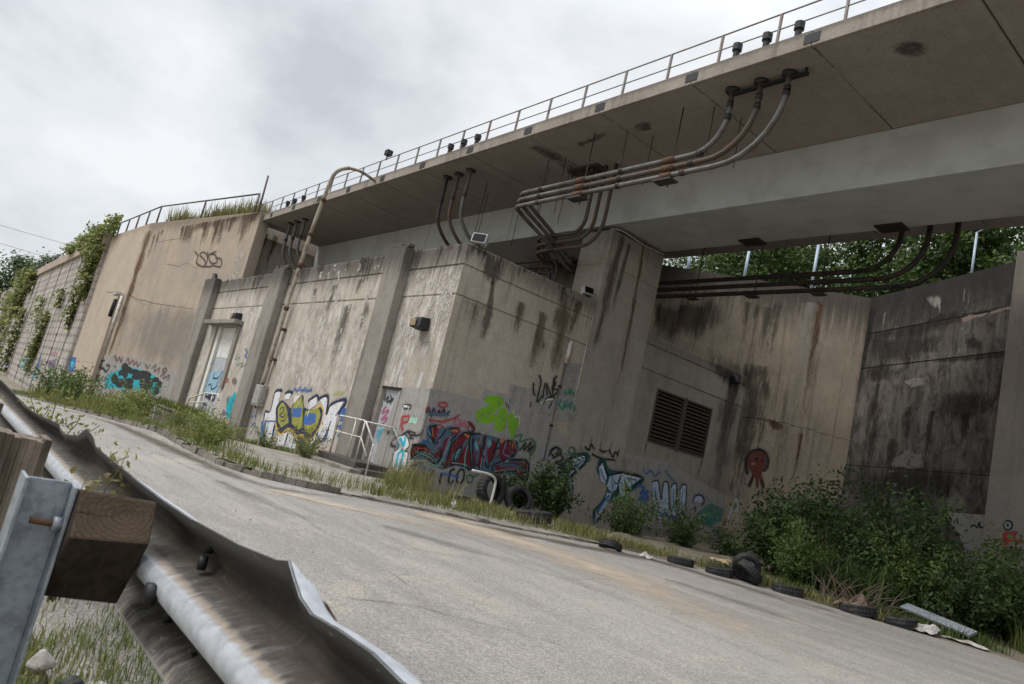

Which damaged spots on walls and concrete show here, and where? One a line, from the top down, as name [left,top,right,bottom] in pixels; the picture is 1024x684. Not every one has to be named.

leakage [181,212,260,245]
leakage [436,243,531,334]
leakage [533,285,582,362]
leakage [594,236,630,342]
corrosion [811,302,822,357]
leakage [860,306,1007,408]